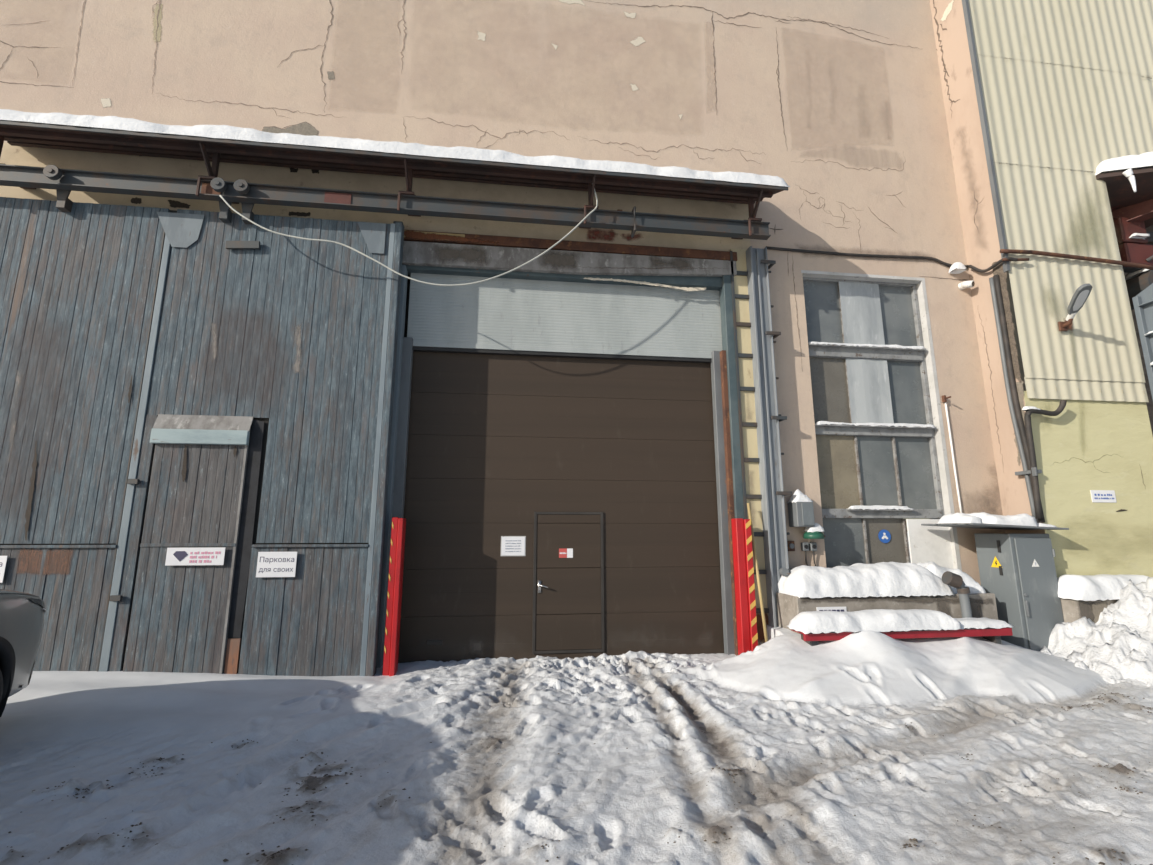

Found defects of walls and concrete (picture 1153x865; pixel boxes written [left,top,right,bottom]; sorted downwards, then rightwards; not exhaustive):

crack [0,0,86,88]
crack [152,0,334,118]
crack [397,0,406,69]
spalling [262,122,318,136]
crack [403,0,960,249]
rust [404,230,498,243]
crack [787,256,803,372]